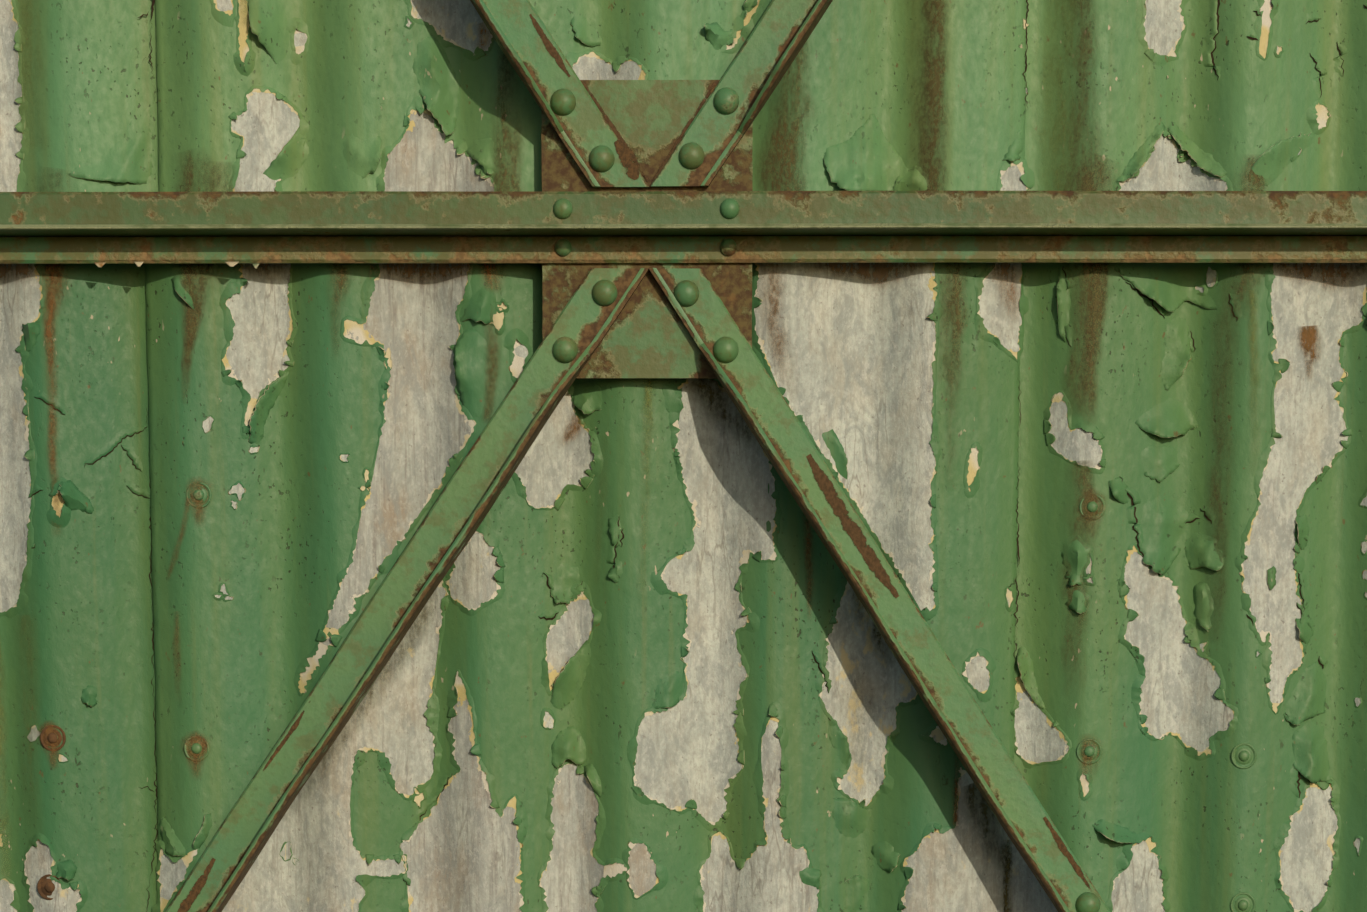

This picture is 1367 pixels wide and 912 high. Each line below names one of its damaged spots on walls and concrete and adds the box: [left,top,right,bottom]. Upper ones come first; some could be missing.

peeling [0,0,30,192]
corrosion [614,140,639,180]
peeling [0,264,94,618]
peeling [294,263,533,696]
peeling [222,525,669,912]
peeling [627,379,826,912]
peeling [752,263,943,622]
corrosion [806,454,899,598]
peeling [1092,819,1171,912]
peeling [1108,263,1367,761]
corrosion [1301,325,1317,360]
peeling [1273,719,1363,912]